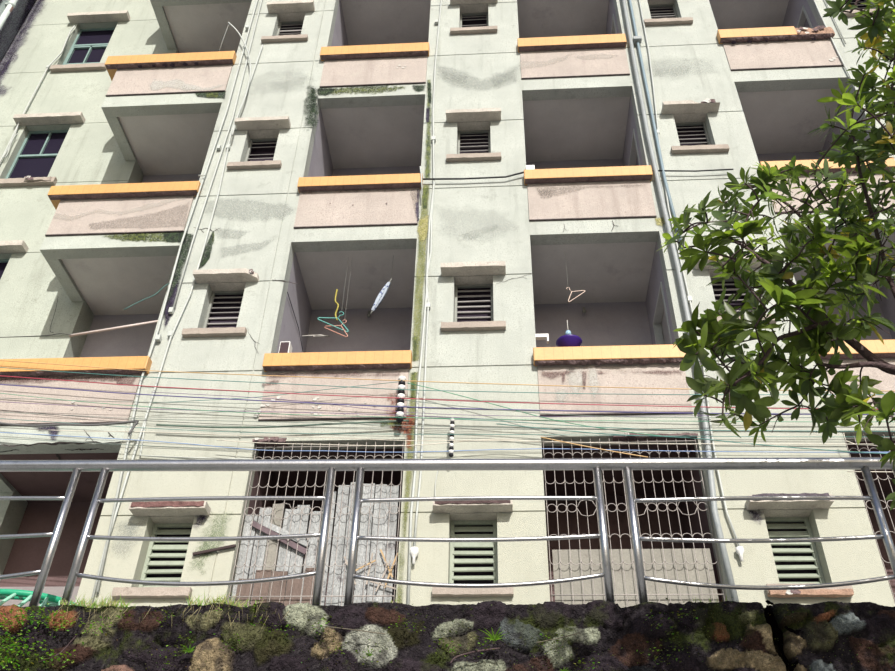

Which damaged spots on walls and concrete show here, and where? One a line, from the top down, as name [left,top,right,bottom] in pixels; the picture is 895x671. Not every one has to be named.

leakage [0,0,44,94]
leakage [304,86,335,128]
leakage [413,83,431,122]
leakage [411,188,428,221]
leakage [55,197,193,326]
rust [381,398,415,447]
crack [765,600,801,671]